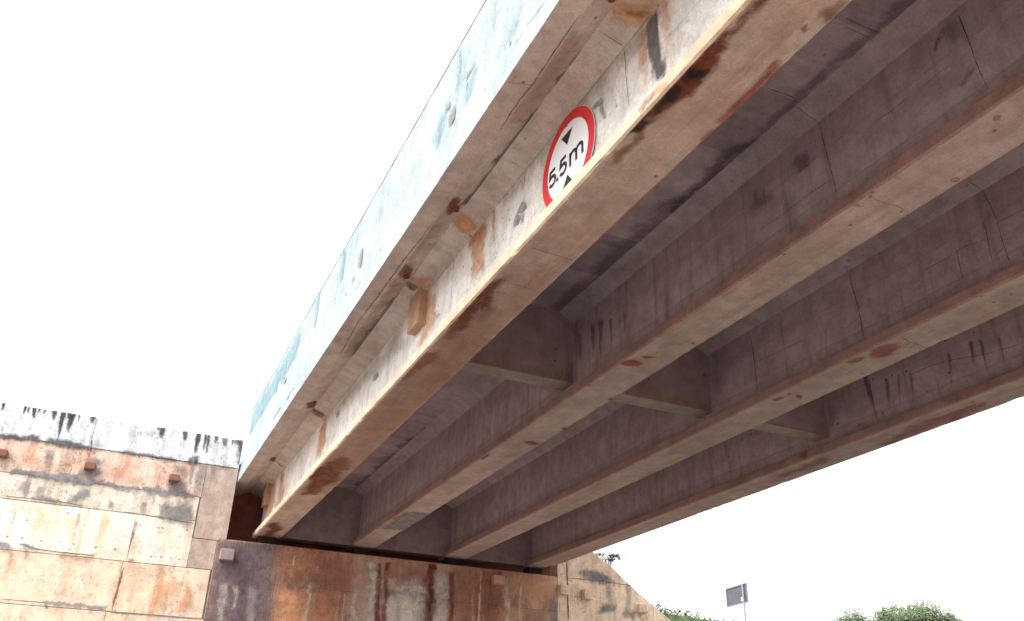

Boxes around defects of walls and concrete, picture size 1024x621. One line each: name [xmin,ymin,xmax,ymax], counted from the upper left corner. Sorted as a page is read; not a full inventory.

rust [614,0,777,162]
rust [447,198,494,275]
rust [871,345,898,356]
damp [0,406,243,524]
rust [301,458,347,495]
rust [178,586,191,612]
rust [274,552,349,621]
rust [374,563,390,621]
rust [423,564,436,621]
rust [448,573,496,621]